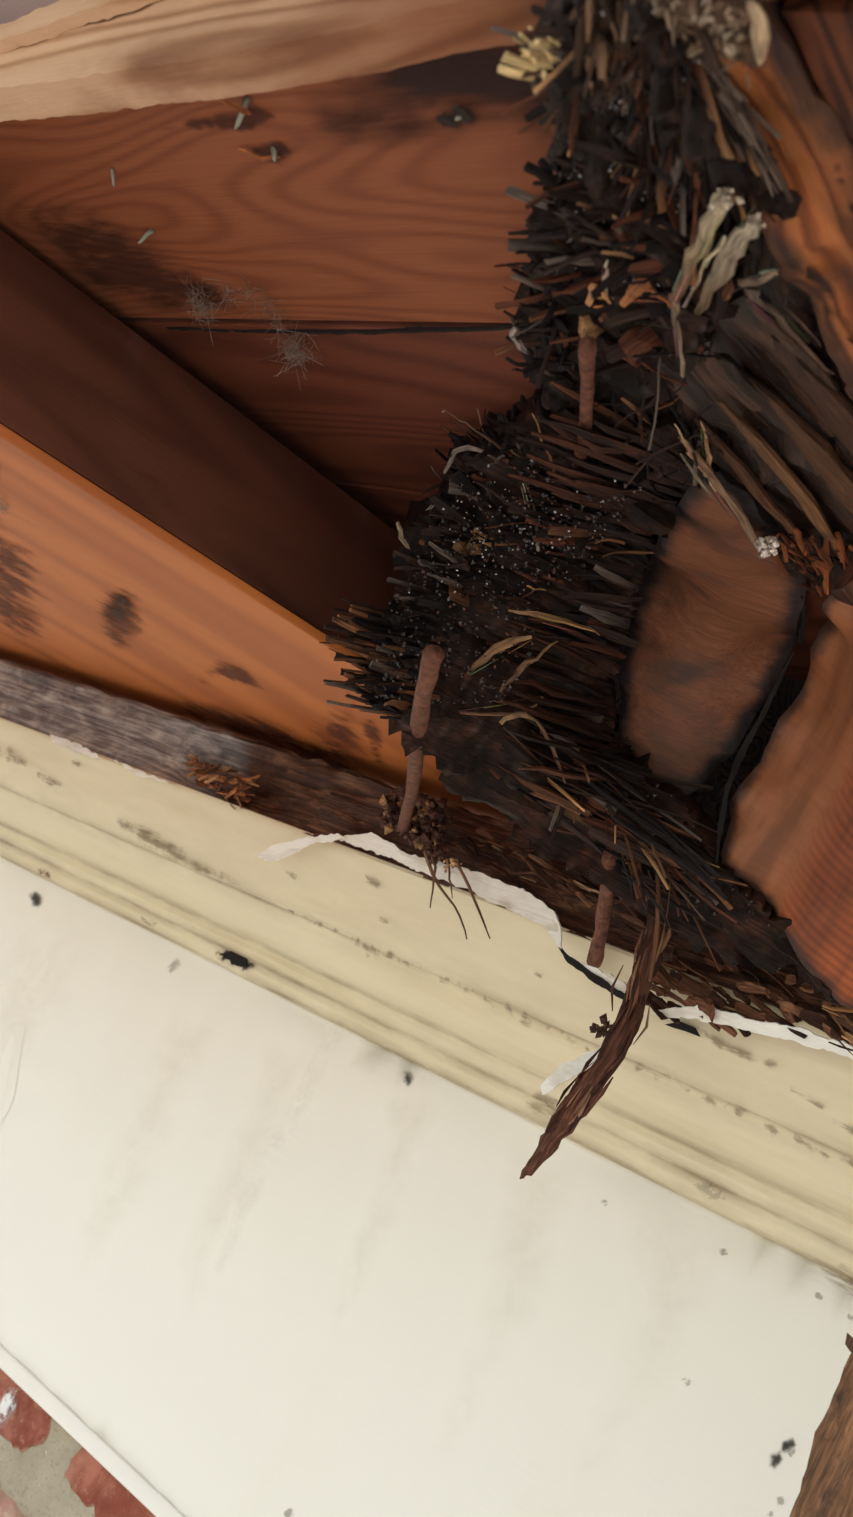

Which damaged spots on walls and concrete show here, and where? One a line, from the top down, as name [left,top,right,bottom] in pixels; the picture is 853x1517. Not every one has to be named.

damp [52,224,219,306]
damp [0,540,37,634]
damp [104,595,138,645]
damp [217,664,256,686]
damp [187,707,381,771]
peeling [256,832,562,949]
peeling [580,962,627,993]
peeling [649,1005,853,1060]
peeling [540,1047,601,1095]